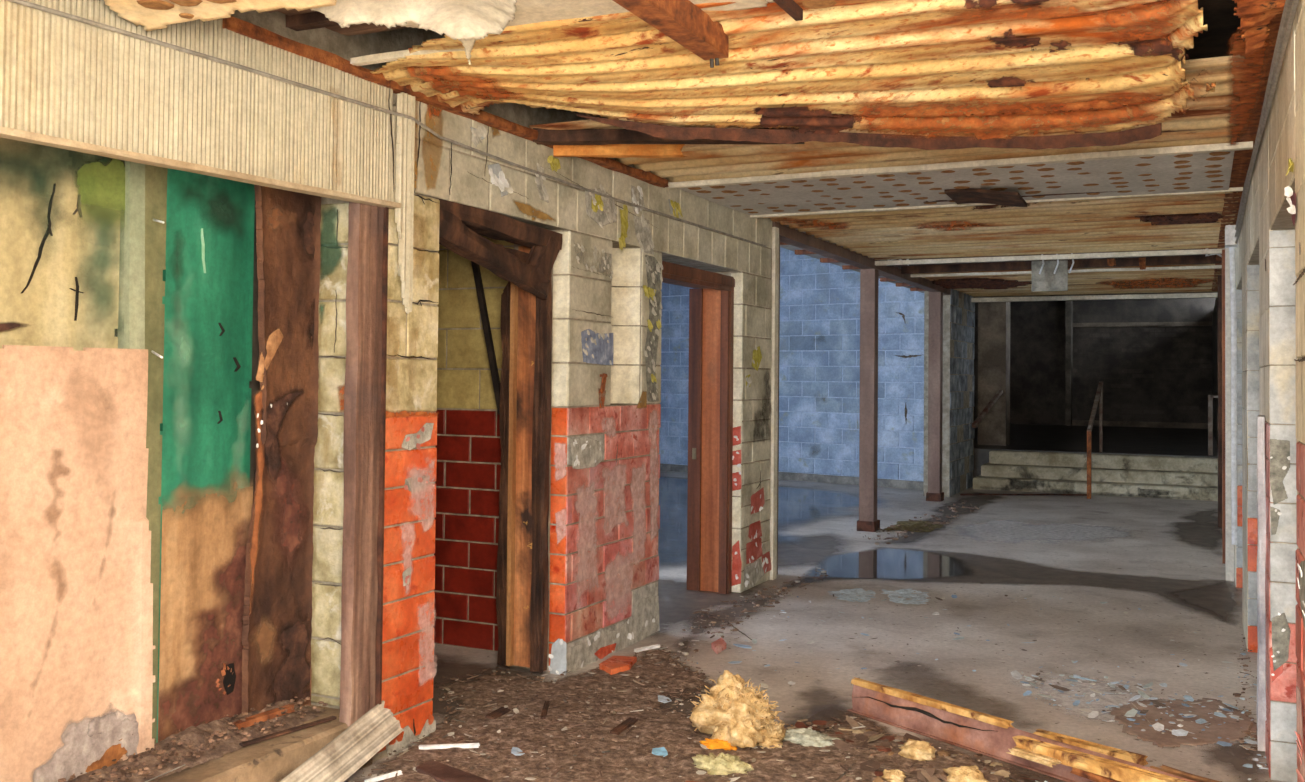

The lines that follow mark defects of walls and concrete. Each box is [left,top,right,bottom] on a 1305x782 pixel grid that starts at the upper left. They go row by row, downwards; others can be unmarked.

rust [947,0,1189,62]
rust [406,66,517,118]
rust [754,76,1165,140]
crack [21,183,82,293]
spalling [402,423,434,450]
spalling [570,437,602,469]
flaking render [732,426,771,590]
spalling [402,567,411,586]
spalling [548,596,659,675]
flaking render [1270,560,1305,681]